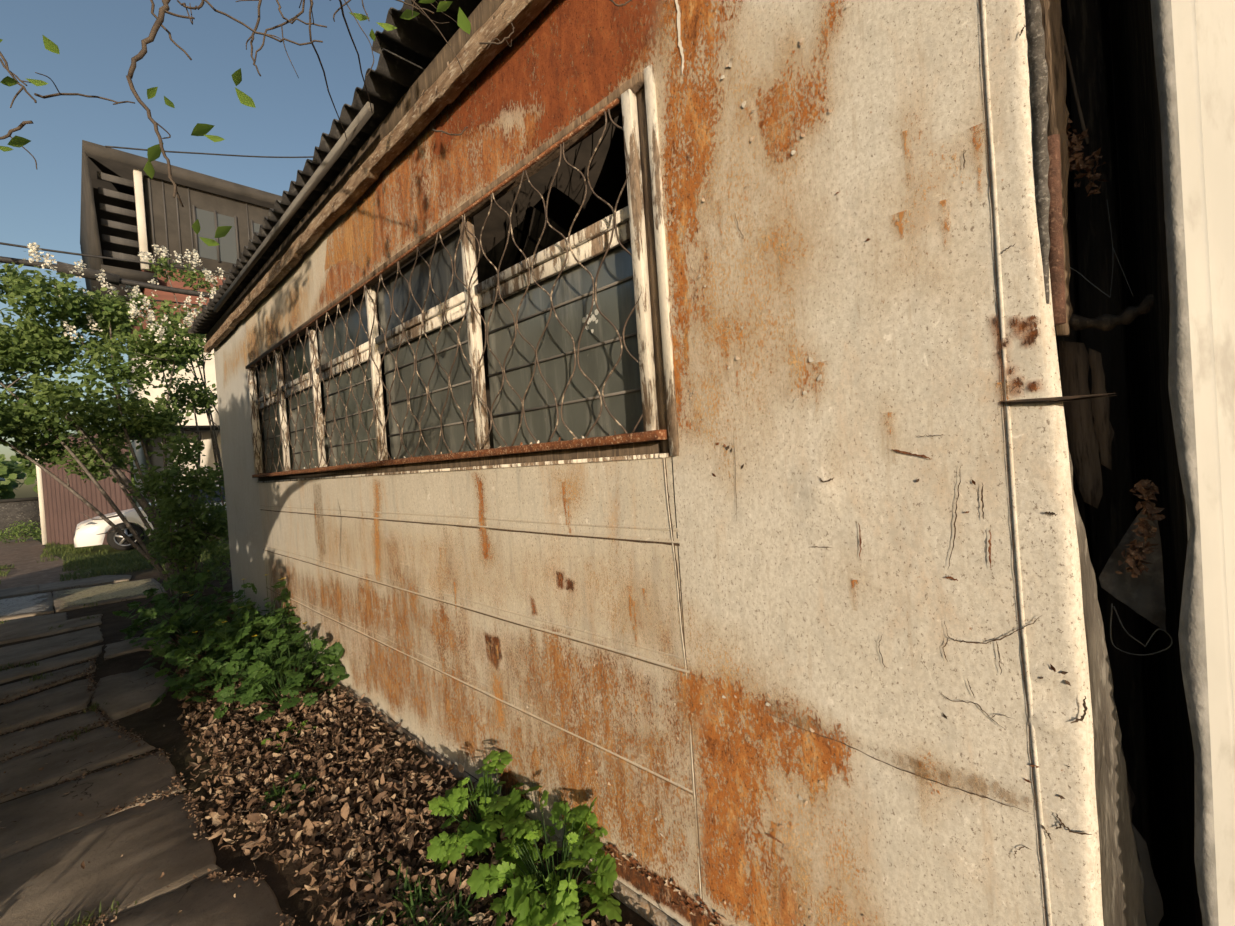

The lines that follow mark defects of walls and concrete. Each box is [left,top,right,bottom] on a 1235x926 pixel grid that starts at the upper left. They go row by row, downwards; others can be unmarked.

corrosion [224,0,850,484]
corrosion [553,464,585,533]
corrosion [270,470,885,926]